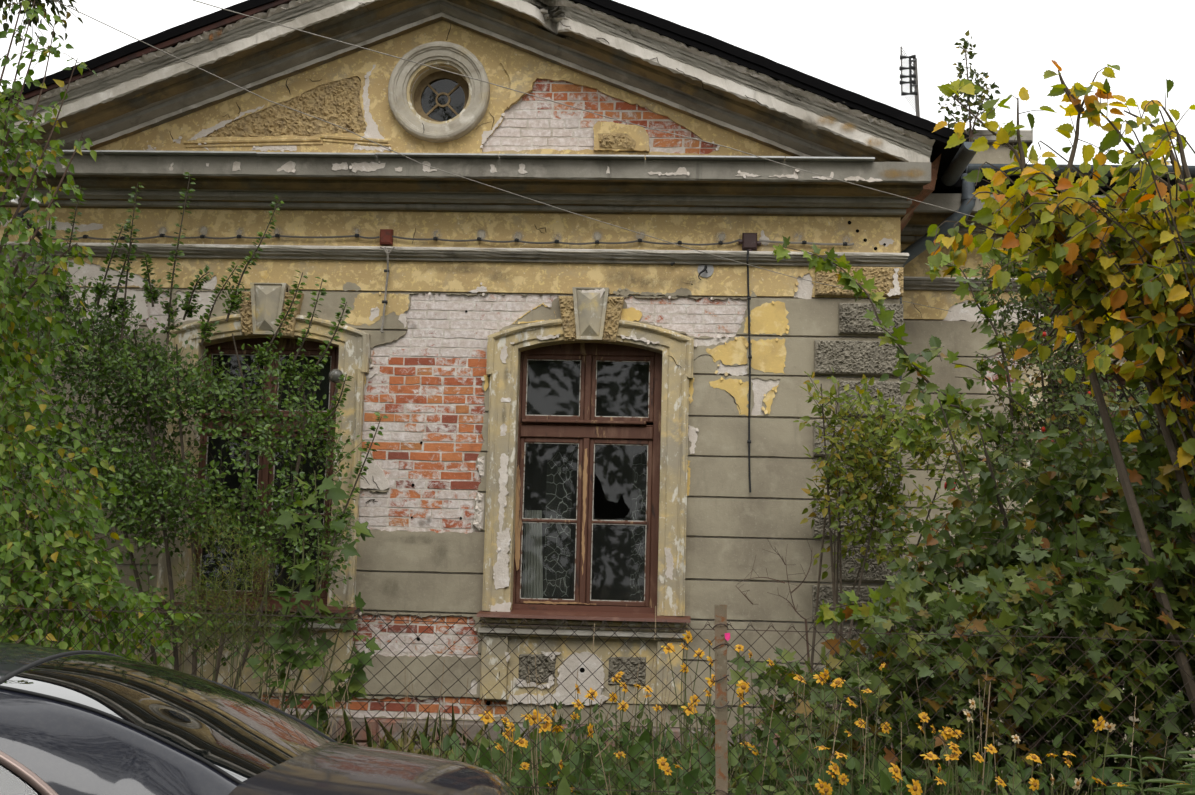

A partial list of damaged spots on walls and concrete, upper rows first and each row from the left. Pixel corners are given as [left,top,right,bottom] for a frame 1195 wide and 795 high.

flaking render [480,79,720,176]
peeling [736,169,883,182]
flaking render [582,273,814,416]
flaking render [343,282,559,534]
peeling [491,453,596,612]
flaking render [353,612,479,659]
flaking render [261,651,609,720]